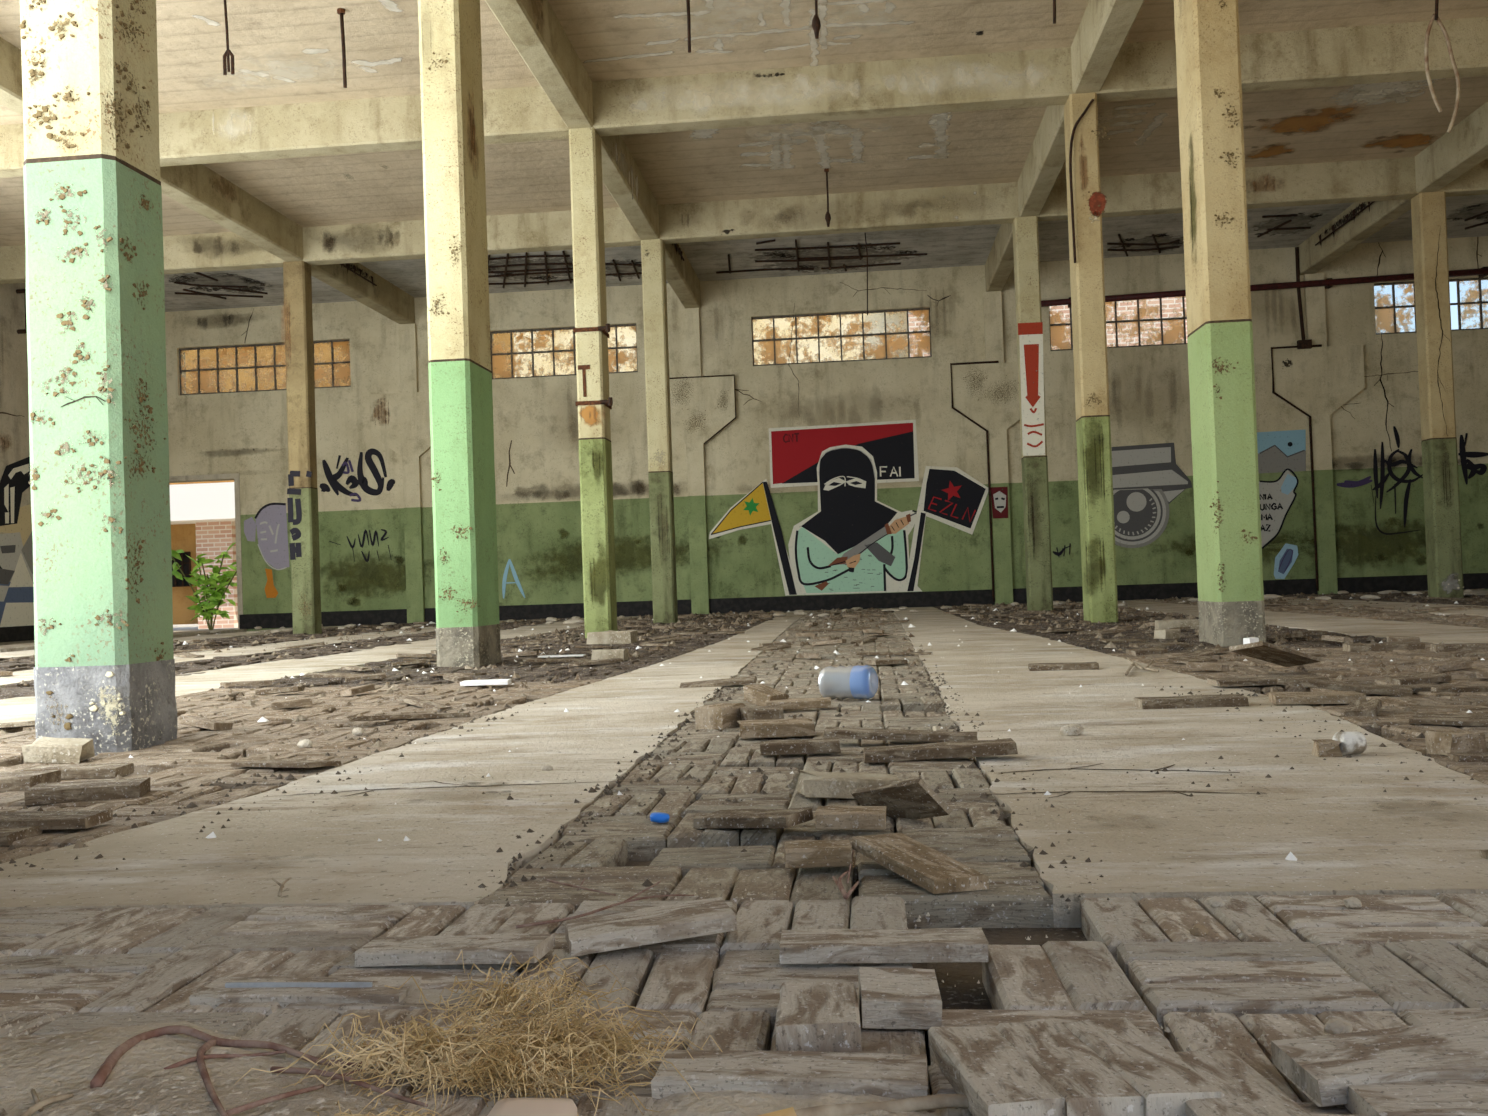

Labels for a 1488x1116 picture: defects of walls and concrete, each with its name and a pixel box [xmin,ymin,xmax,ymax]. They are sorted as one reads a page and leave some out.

rust [1247,107,1356,159]
rust [1364,134,1433,148]
spalling [1257,201,1375,246]
spalling [174,272,268,299]
spalling [605,259,642,281]
damp [593,452,603,477]
damp [1083,436,1105,507]
damp [1086,541,1105,592]